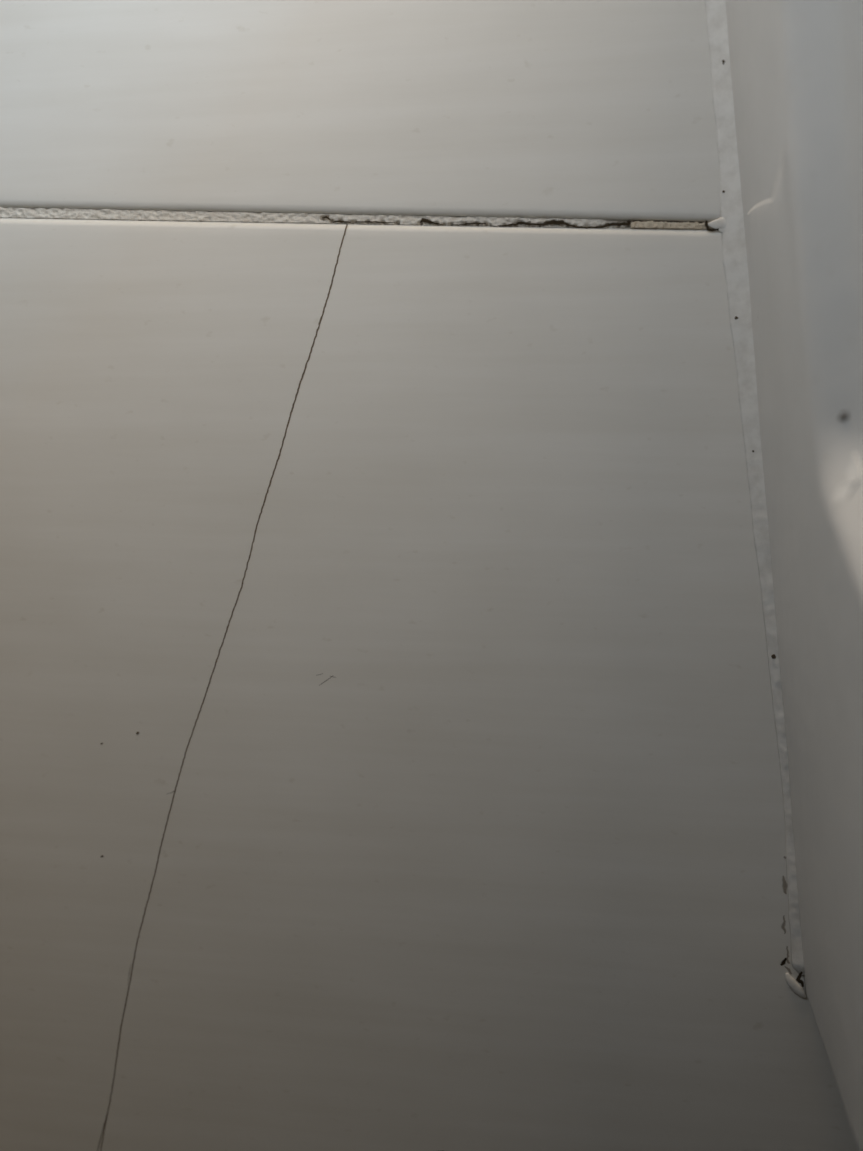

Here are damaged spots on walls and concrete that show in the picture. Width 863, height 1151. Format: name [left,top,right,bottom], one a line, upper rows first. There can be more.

crack [97,216,634,1151]